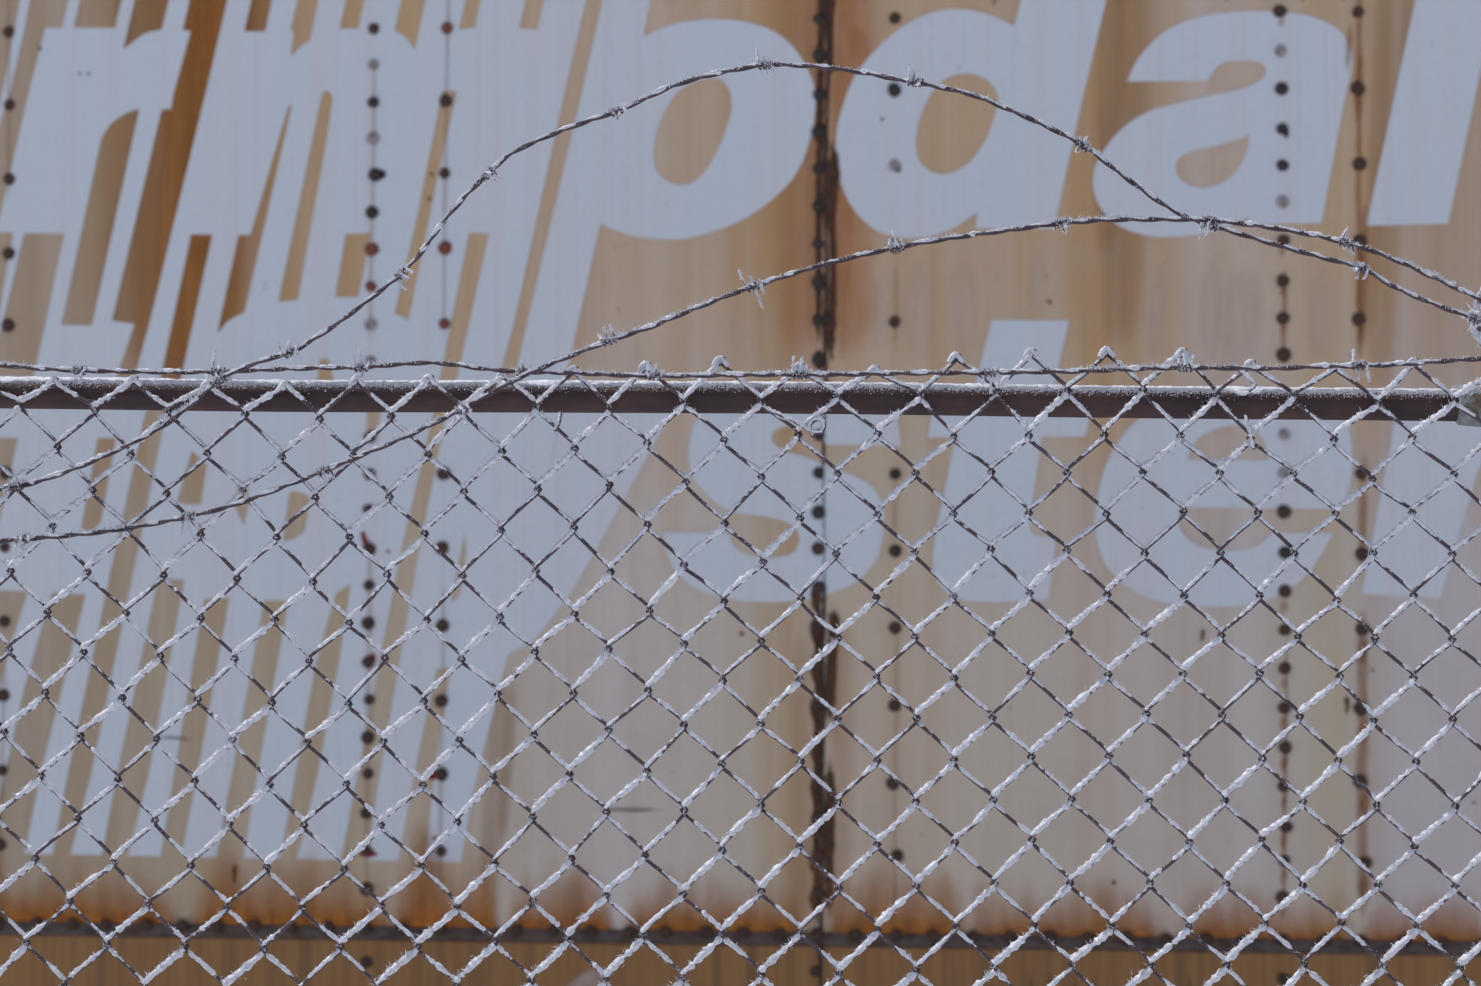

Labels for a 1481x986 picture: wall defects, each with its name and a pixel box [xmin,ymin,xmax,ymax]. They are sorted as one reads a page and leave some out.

rust [814,0,840,371]
rust [204,865,379,927]
rust [0,901,164,924]
rust [400,895,494,928]
rust [515,907,609,930]
rust [633,910,796,932]
rust [985,918,1151,937]
rust [1187,921,1343,940]
rust [1371,928,1478,942]